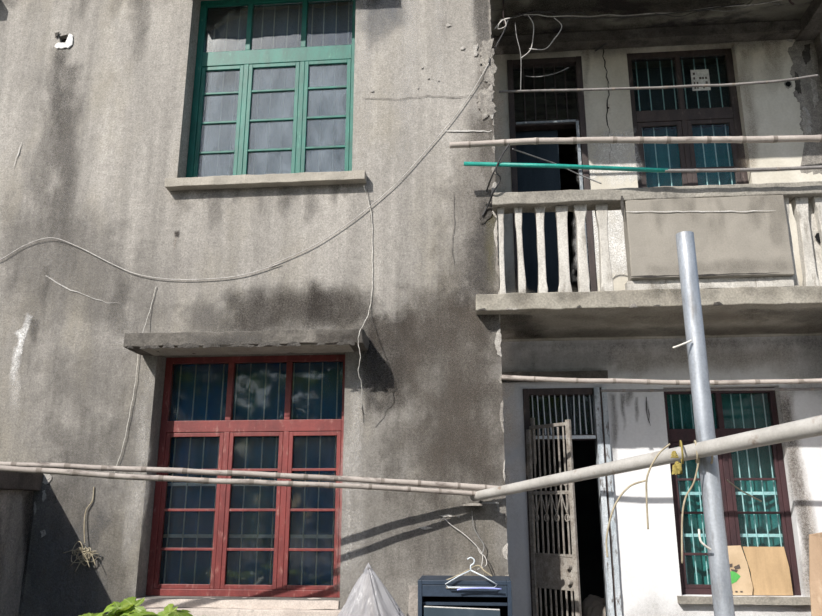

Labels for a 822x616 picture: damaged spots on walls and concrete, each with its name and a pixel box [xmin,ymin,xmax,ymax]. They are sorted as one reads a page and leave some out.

spalling [54,32,73,48]
spalling [460,7,497,154]
leakage [475,0,489,40]
crack [602,49,612,163]
leakage [504,0,740,36]
flaking render [784,39,822,175]
spalling [479,167,499,276]
leakage [189,287,505,482]
spalling [495,308,519,357]
flaking render [33,474,52,515]